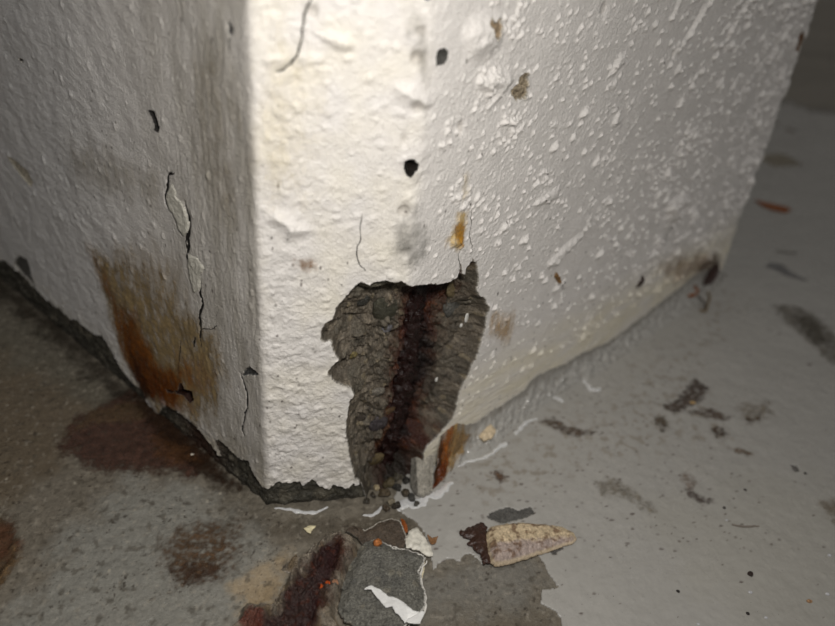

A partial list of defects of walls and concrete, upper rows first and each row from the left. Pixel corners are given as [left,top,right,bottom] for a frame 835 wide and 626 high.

crack [275,0,311,72]
peeling [511,72,530,101]
corrosion [450,213,465,248]
crack [165,172,216,370]
peeling [0,255,146,399]
corrosion [58,256,242,491]
crack [240,375,248,438]
spalling [158,258,490,505]
corrosion [432,423,469,489]